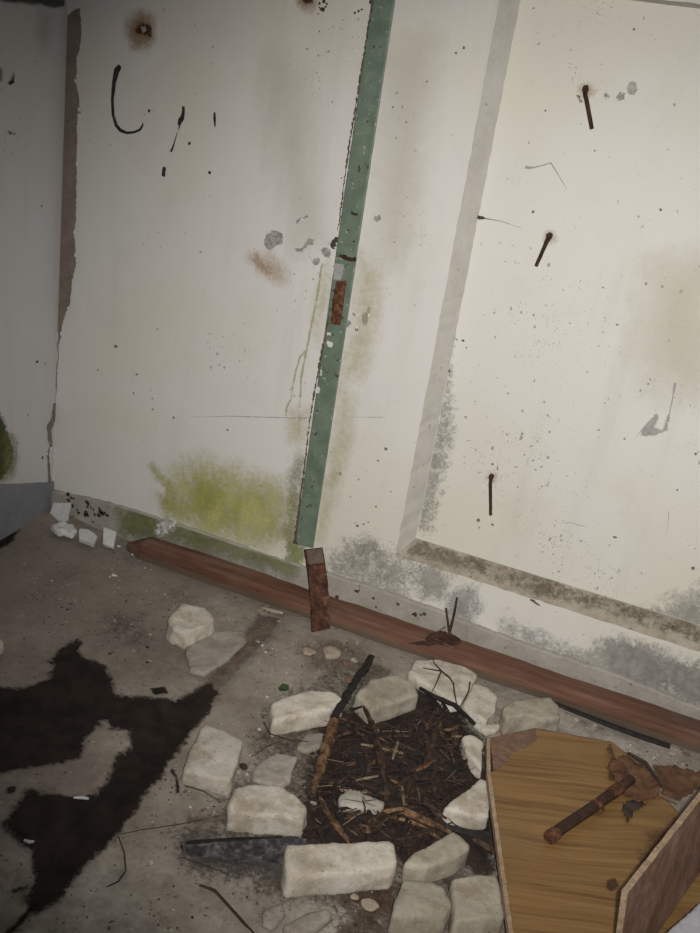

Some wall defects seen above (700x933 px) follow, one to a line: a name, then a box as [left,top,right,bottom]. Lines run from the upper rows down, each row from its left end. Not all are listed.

corrosion [130,16,152,46]
flaking render [58,5,81,336]
flaking render [47,403,56,482]
water stain [331,540,486,622]
water stain [511,576,602,605]
water stain [615,595,700,642]
water stain [509,625,700,702]